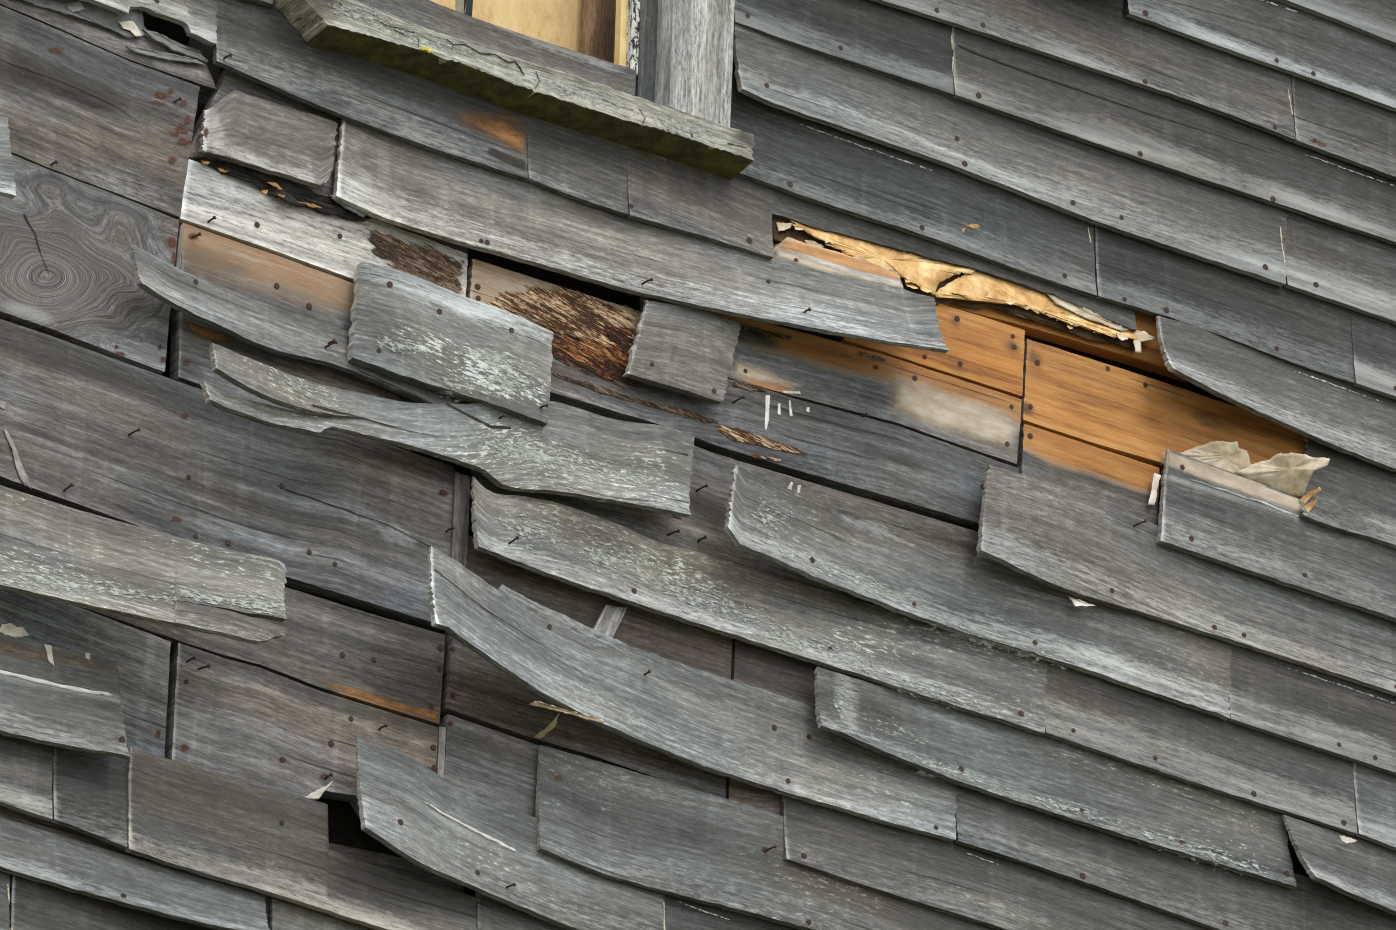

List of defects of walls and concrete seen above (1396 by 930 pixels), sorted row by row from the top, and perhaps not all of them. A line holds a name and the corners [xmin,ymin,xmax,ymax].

peeling [773,241,902,286]